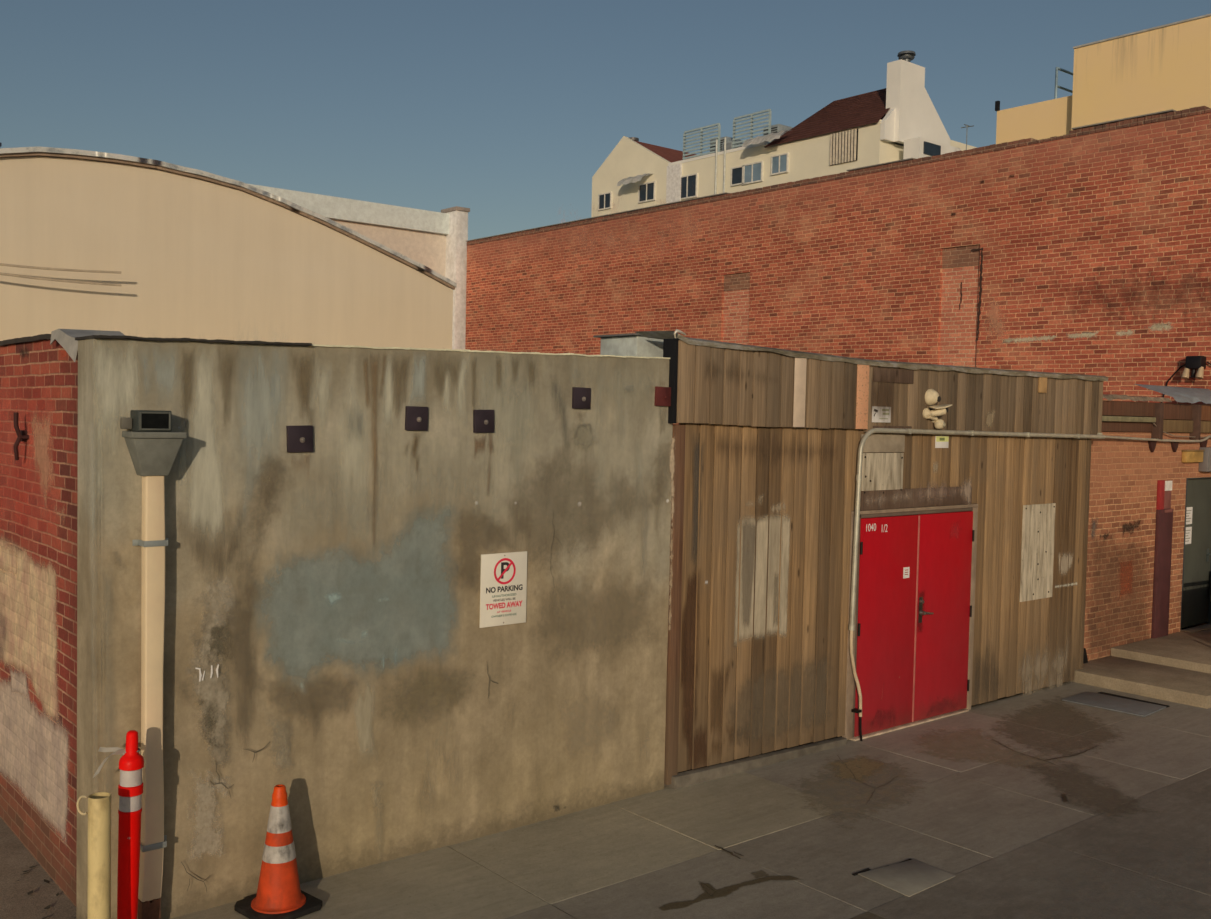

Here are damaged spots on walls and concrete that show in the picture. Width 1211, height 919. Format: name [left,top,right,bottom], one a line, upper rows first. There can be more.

leakage [95,346,138,438]
leakage [158,356,232,565]
leakage [299,361,327,408]
leakage [364,362,475,479]
peeling [11,672,27,696]